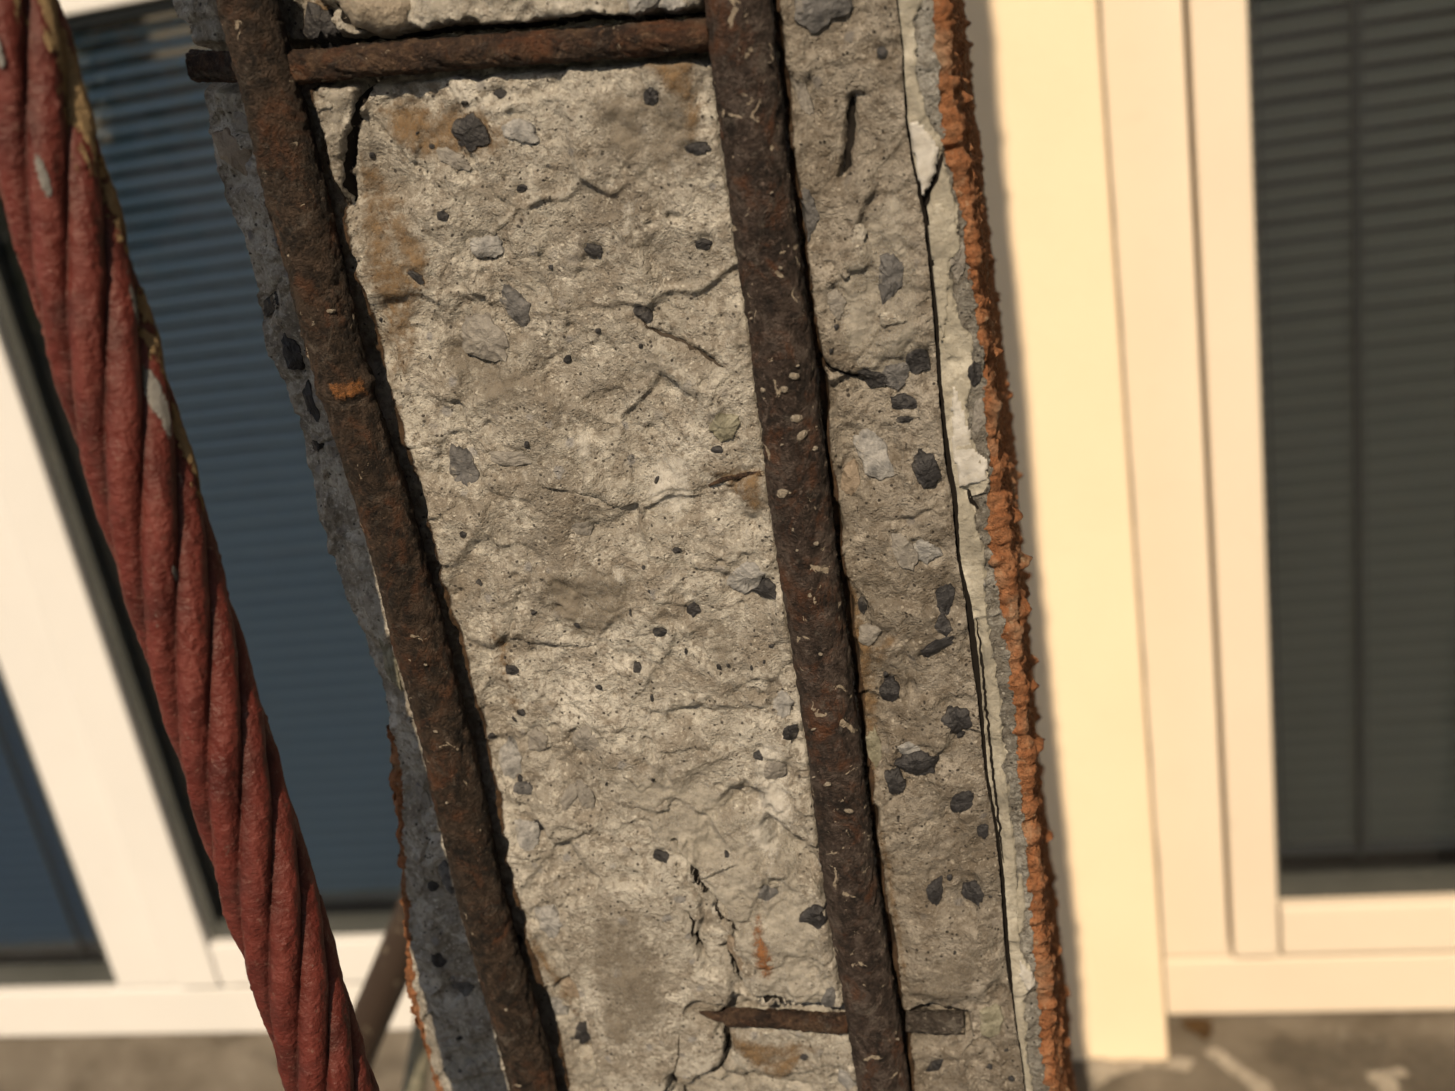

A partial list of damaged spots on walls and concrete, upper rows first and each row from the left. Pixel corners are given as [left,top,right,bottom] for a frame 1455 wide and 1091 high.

crack [337,0,706,42]
crack [342,84,376,201]
corrosion [329,161,427,478]
spalling [839,201,914,372]
peeling [909,121,961,341]
corrosion [773,0,915,1091]
crack [896,0,1026,1091]
peeling [951,387,988,487]
corrosion [427,517,578,1016]
spalling [622,775,834,1007]
crack [671,866,795,1091]
corrosion [753,917,773,977]